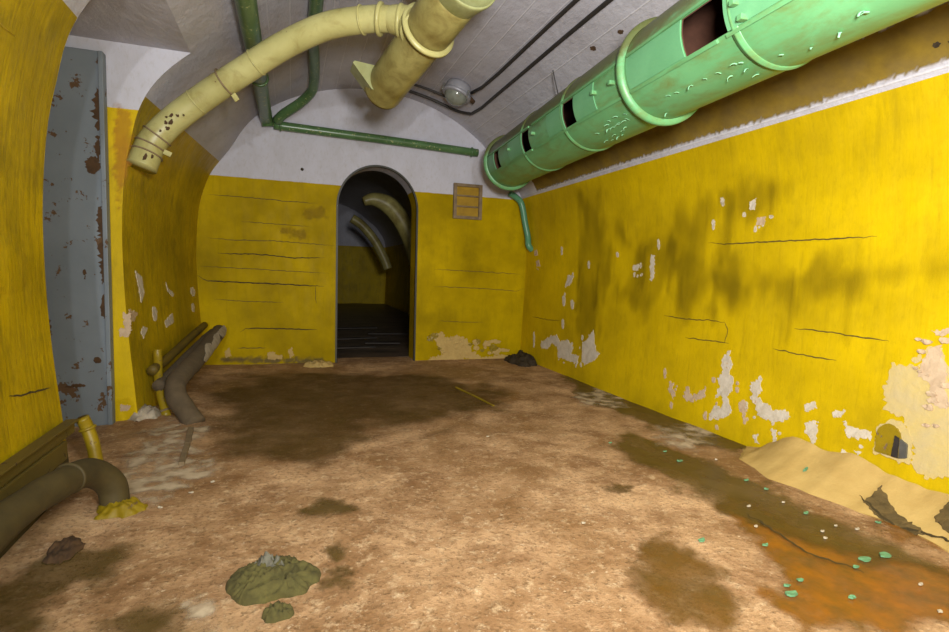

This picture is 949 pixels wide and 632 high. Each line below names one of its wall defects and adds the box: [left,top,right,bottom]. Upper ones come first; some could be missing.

rust [96,206,111,319]
peeling [633,239,660,281]
peeling [118,271,174,339]
peeling [562,273,574,309]
peeling [427,332,510,360]
peeling [533,319,600,367]
leakage [216,358,502,460]
peeling [663,350,790,442]
peeling [804,401,819,444]
peeling [832,409,872,455]
peeling [882,328,949,480]
spalling [934,502,949,533]